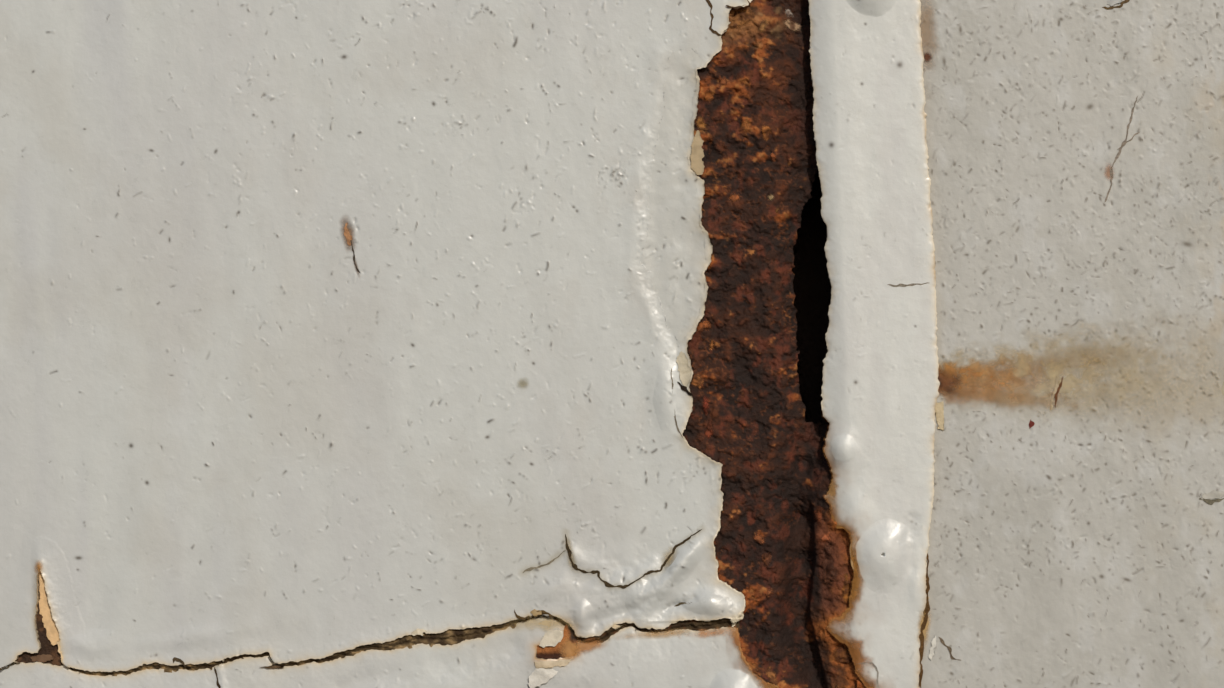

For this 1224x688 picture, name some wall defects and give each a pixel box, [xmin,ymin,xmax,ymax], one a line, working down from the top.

peeling [706,0,752,36]
peeling [1103,0,1130,10]
corrosion [343,222,360,272]
corrosion [683,0,875,688]
corrosion [935,346,1114,431]
crack [523,529,702,589]
peeling [16,564,64,666]
crack [70,602,744,688]
spalling [528,624,578,688]